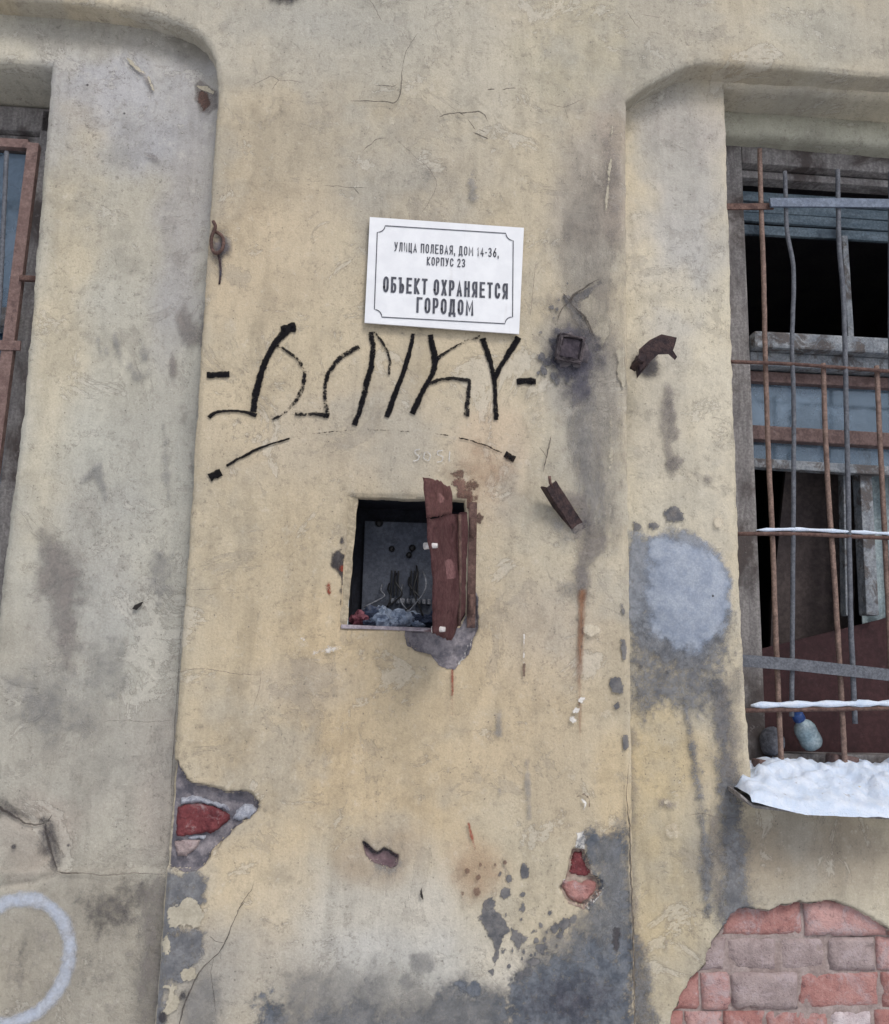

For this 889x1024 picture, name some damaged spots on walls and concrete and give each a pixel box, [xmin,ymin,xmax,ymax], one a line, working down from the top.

spalling [195,81,217,112]
leakage [549,254,616,593]
spalling [405,593,479,670]
crack [0,806,163,876]
spalling [156,763,259,1024]
crack [179,886,253,1024]
peeling [252,828,634,1024]
leakage [634,934,661,1024]
spalling [670,900,889,1024]